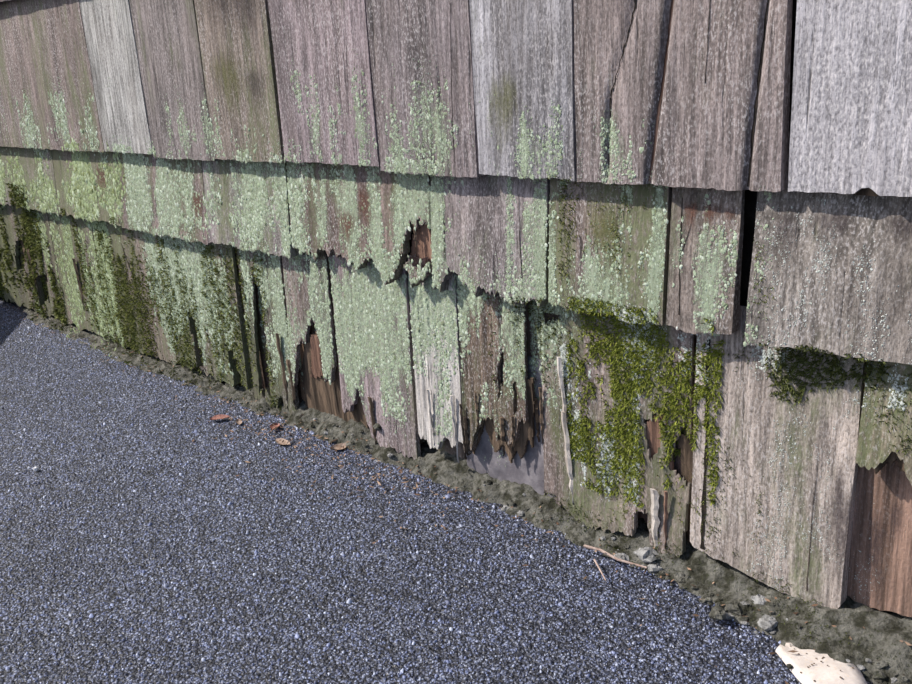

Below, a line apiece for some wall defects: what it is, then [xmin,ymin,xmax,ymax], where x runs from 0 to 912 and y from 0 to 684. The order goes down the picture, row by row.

crack [606,0,637,178]
crack [648,0,674,181]
crack [704,0,712,83]
crack [747,0,769,187]
leakage [341,191,371,238]
spalling [311,418,369,452]